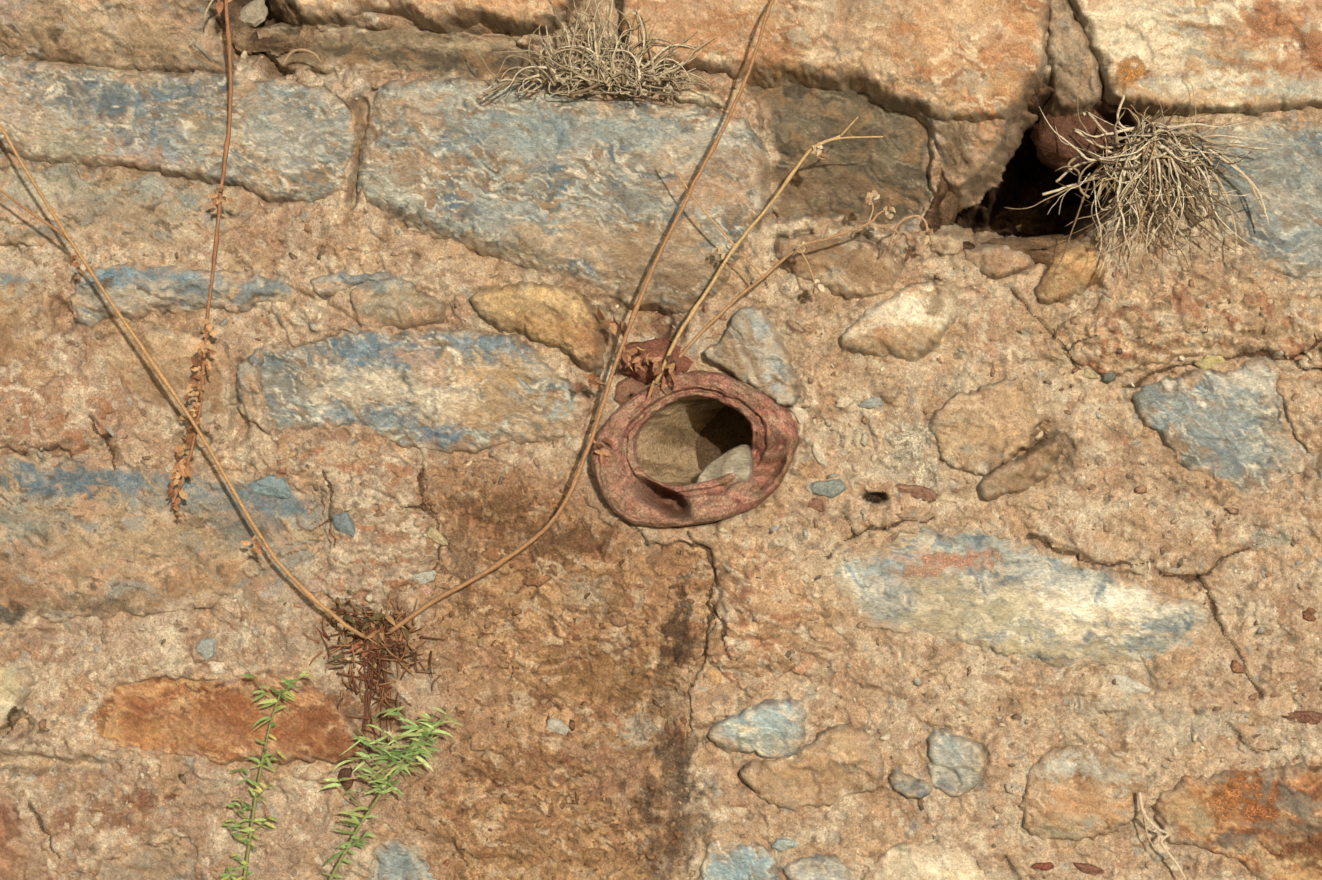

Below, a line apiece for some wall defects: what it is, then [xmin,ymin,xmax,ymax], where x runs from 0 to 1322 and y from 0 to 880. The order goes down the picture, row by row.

leakage [449,478,618,610]
leakage [660,572,695,695]
crack [687,531,731,660]
crack [1026,533,1263,700]
crack [1225,722,1278,753]